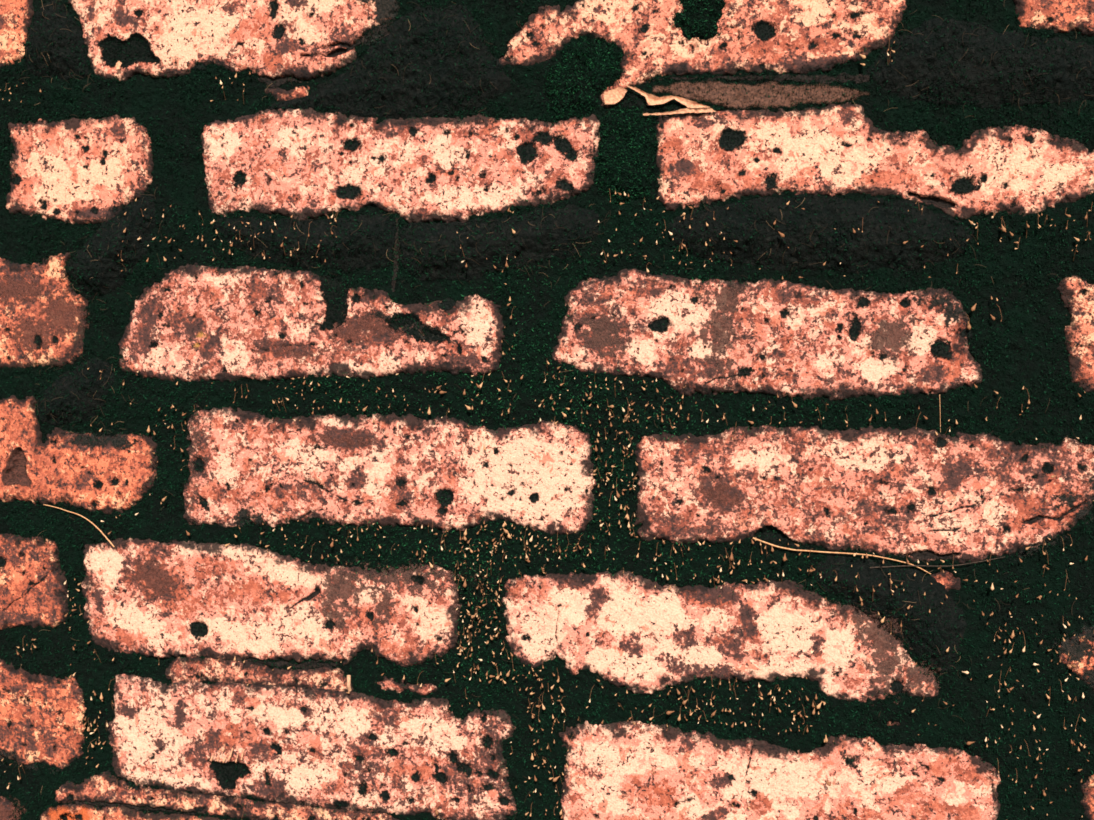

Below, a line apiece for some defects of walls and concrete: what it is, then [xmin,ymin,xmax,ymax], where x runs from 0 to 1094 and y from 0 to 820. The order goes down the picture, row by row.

spalling [97,32,161,70]
hole [74,134,107,170]
hole [76,460,128,508]
hole [501,482,539,504]
crack [4,569,58,610]